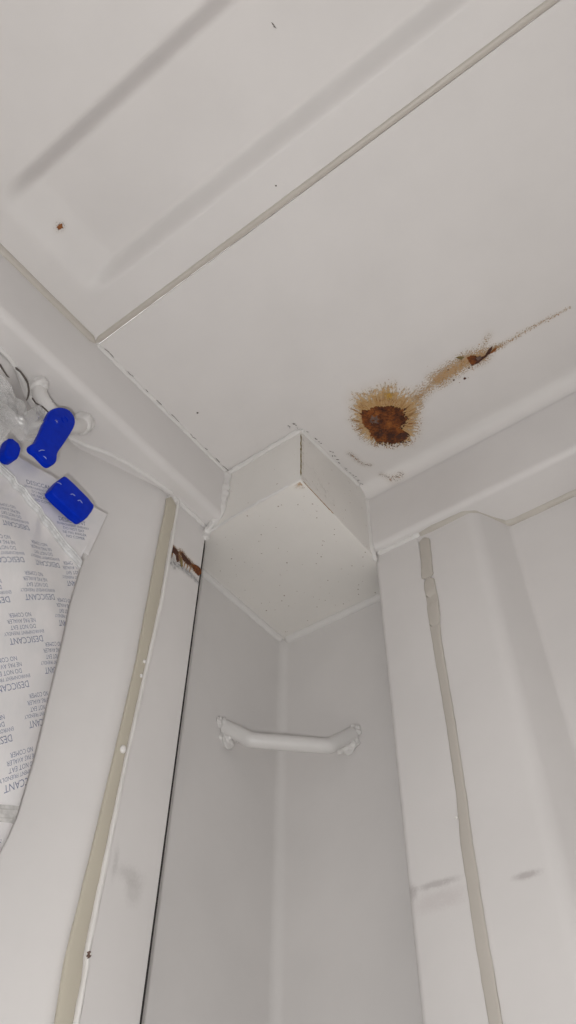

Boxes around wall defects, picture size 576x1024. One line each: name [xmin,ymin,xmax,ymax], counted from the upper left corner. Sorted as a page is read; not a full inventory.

rust [350,307,570,449]
rust [171,545,202,576]